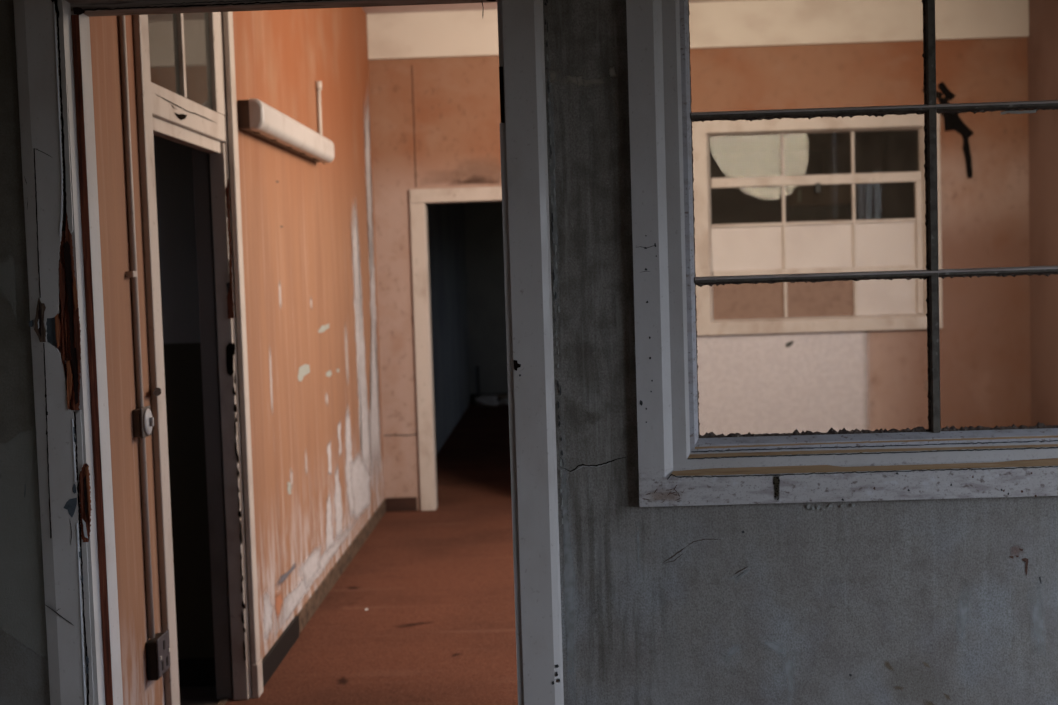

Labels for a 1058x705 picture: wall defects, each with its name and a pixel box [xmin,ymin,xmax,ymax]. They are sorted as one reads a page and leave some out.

peeling [264,110,381,638]
crack [560,457,626,472]